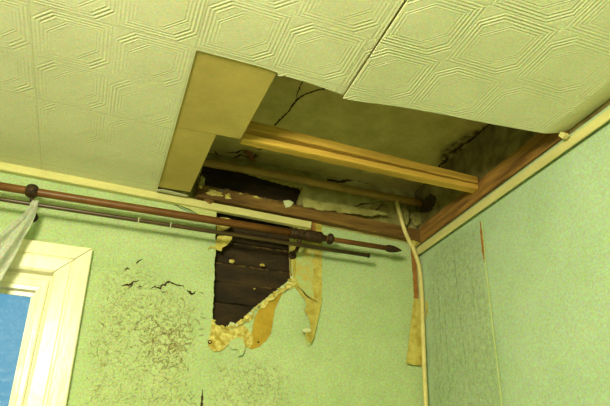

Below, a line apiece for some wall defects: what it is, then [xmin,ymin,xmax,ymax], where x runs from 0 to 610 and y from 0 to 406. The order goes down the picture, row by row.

crack [274,81,325,126]
crack [438,124,490,167]
flaking render [196,175,388,217]
flaking render [400,194,436,226]
flaking render [208,217,232,251]
crack [121,259,203,295]
flaking render [208,274,296,356]